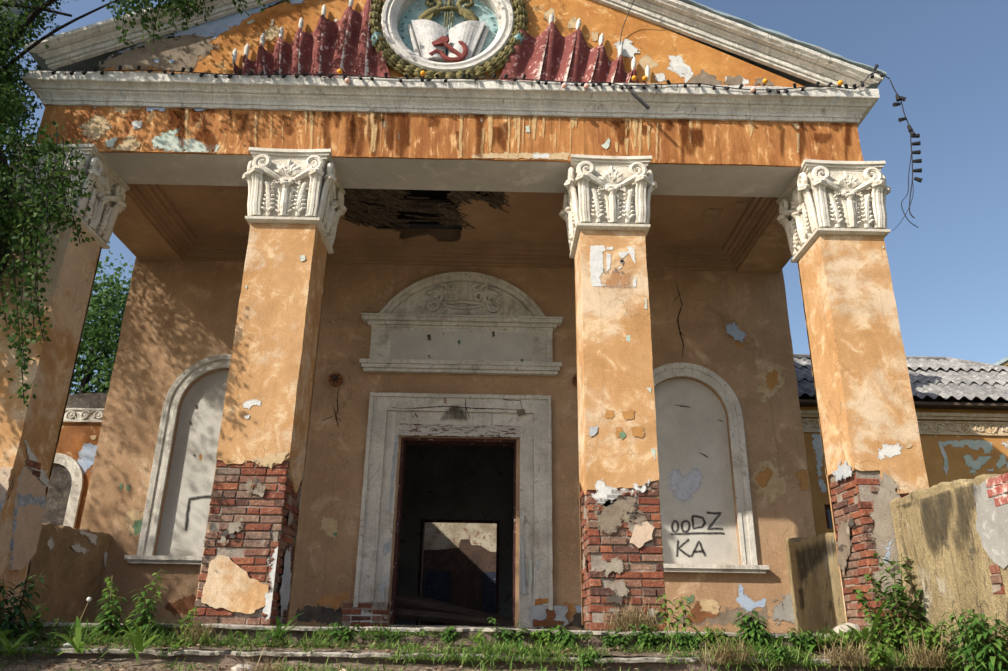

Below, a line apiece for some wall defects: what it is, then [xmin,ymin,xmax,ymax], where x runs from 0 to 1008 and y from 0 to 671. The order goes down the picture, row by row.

peeling [613,39,774,86]
peeling [79,107,220,152]
water stain [304,111,324,149]
water stain [358,112,388,152]
water stain [480,115,492,157]
water stain [504,115,556,157]
water stain [615,118,659,160]
crack [674,286,684,357]
peeling [935,435,1008,507]
spalling [187,450,390,627]
spalling [520,478,795,631]
spalling [750,433,912,632]